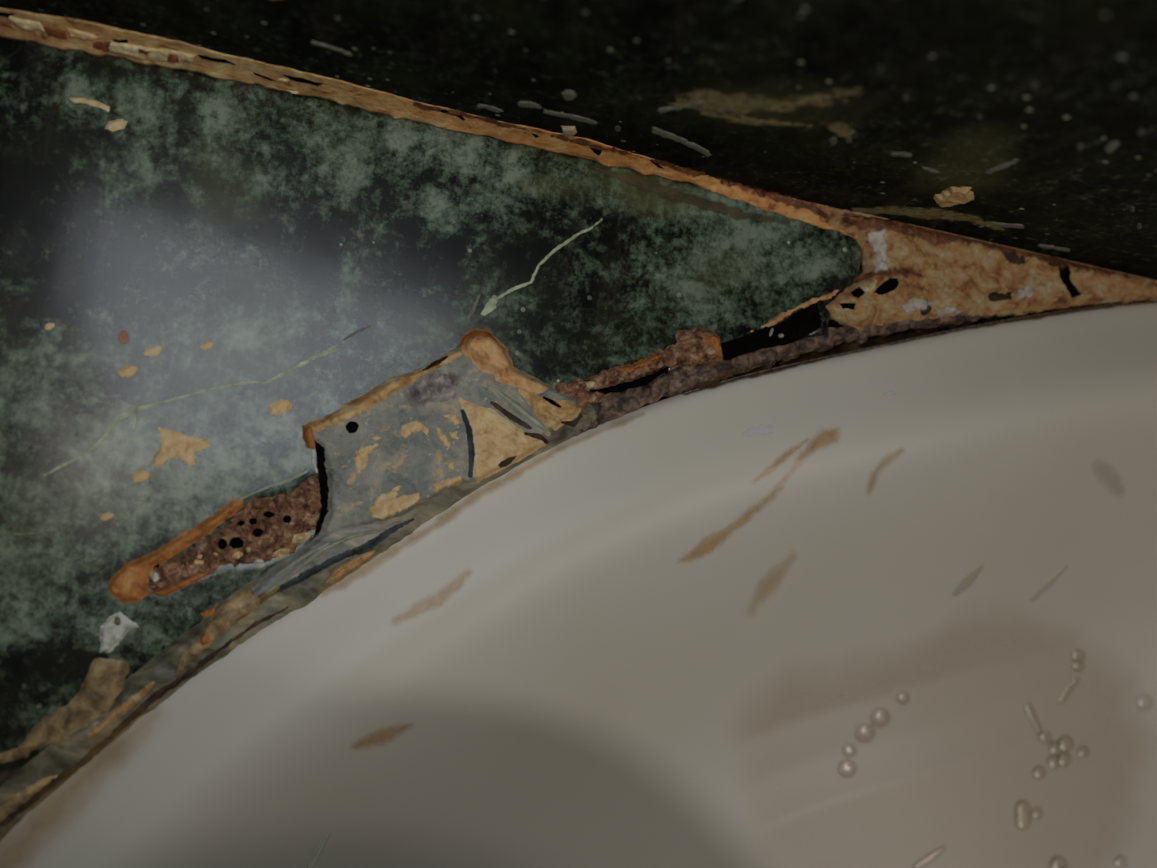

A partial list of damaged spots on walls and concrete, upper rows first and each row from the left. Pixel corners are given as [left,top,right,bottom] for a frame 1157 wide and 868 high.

rust [44,27,68,40]
rust [93,41,111,52]
rust [842,213,1135,277]
crack [464,218,603,325]
rust [853,267,923,283]
rust [750,290,839,332]
rust [552,327,723,409]
peeling [108,328,583,604]
rust [763,431,836,475]
rust [687,511,753,558]
peeling [87,681,155,739]
peeling [26,775,58,794]